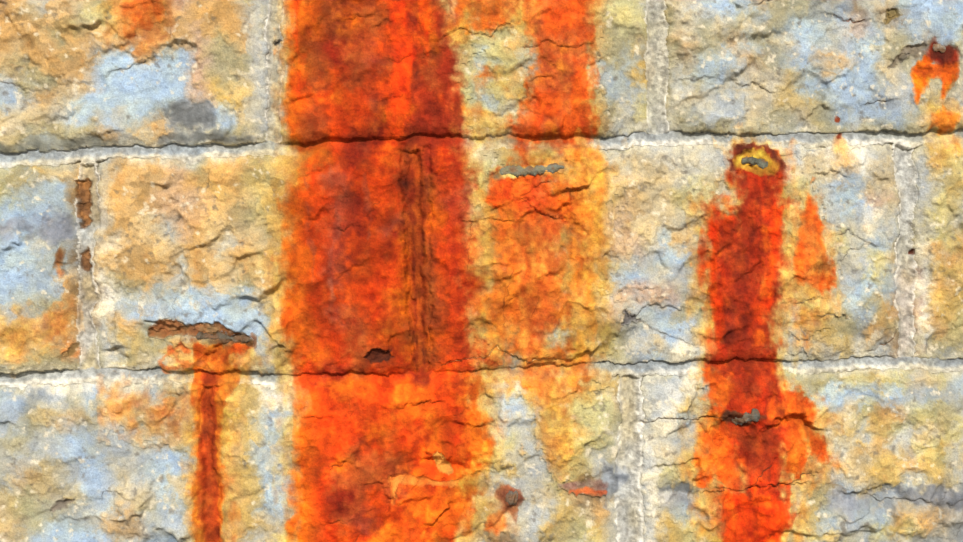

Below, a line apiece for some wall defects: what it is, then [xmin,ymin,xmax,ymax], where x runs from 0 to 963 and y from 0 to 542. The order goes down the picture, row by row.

corrosion [95,0,637,542]
corrosion [670,115,851,542]
corrosion [910,36,963,170]